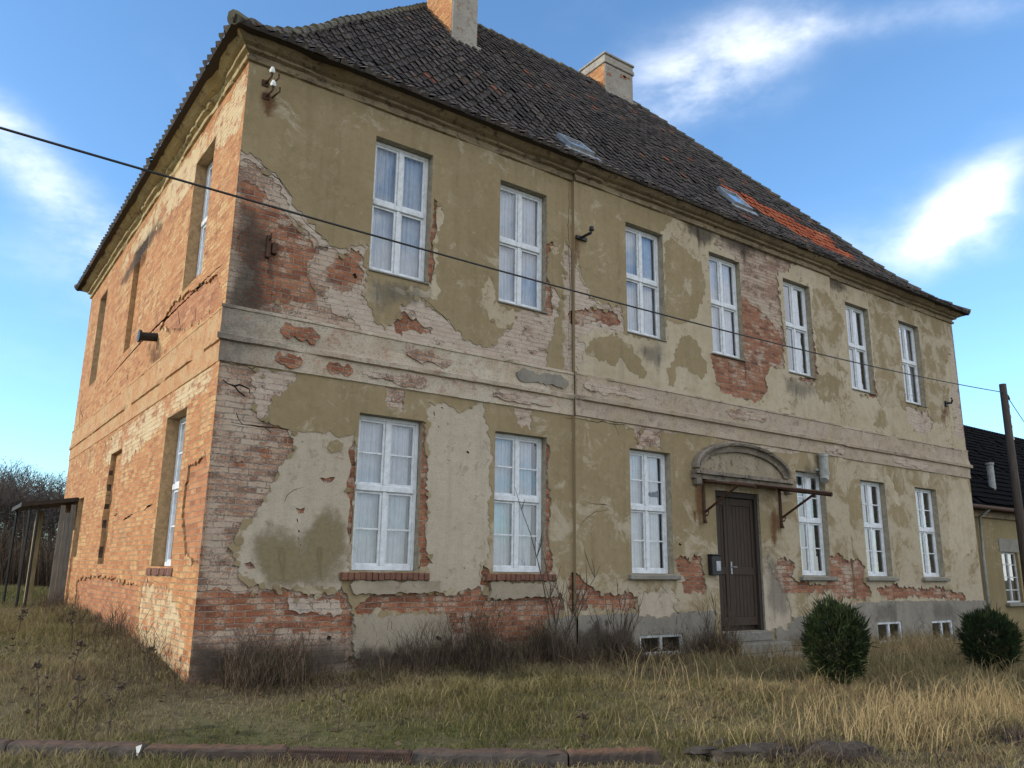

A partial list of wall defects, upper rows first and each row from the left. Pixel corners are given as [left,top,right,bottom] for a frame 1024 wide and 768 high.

crack [105,266,221,384]
crack [223,379,289,433]
flaking render [74,150,966,684]